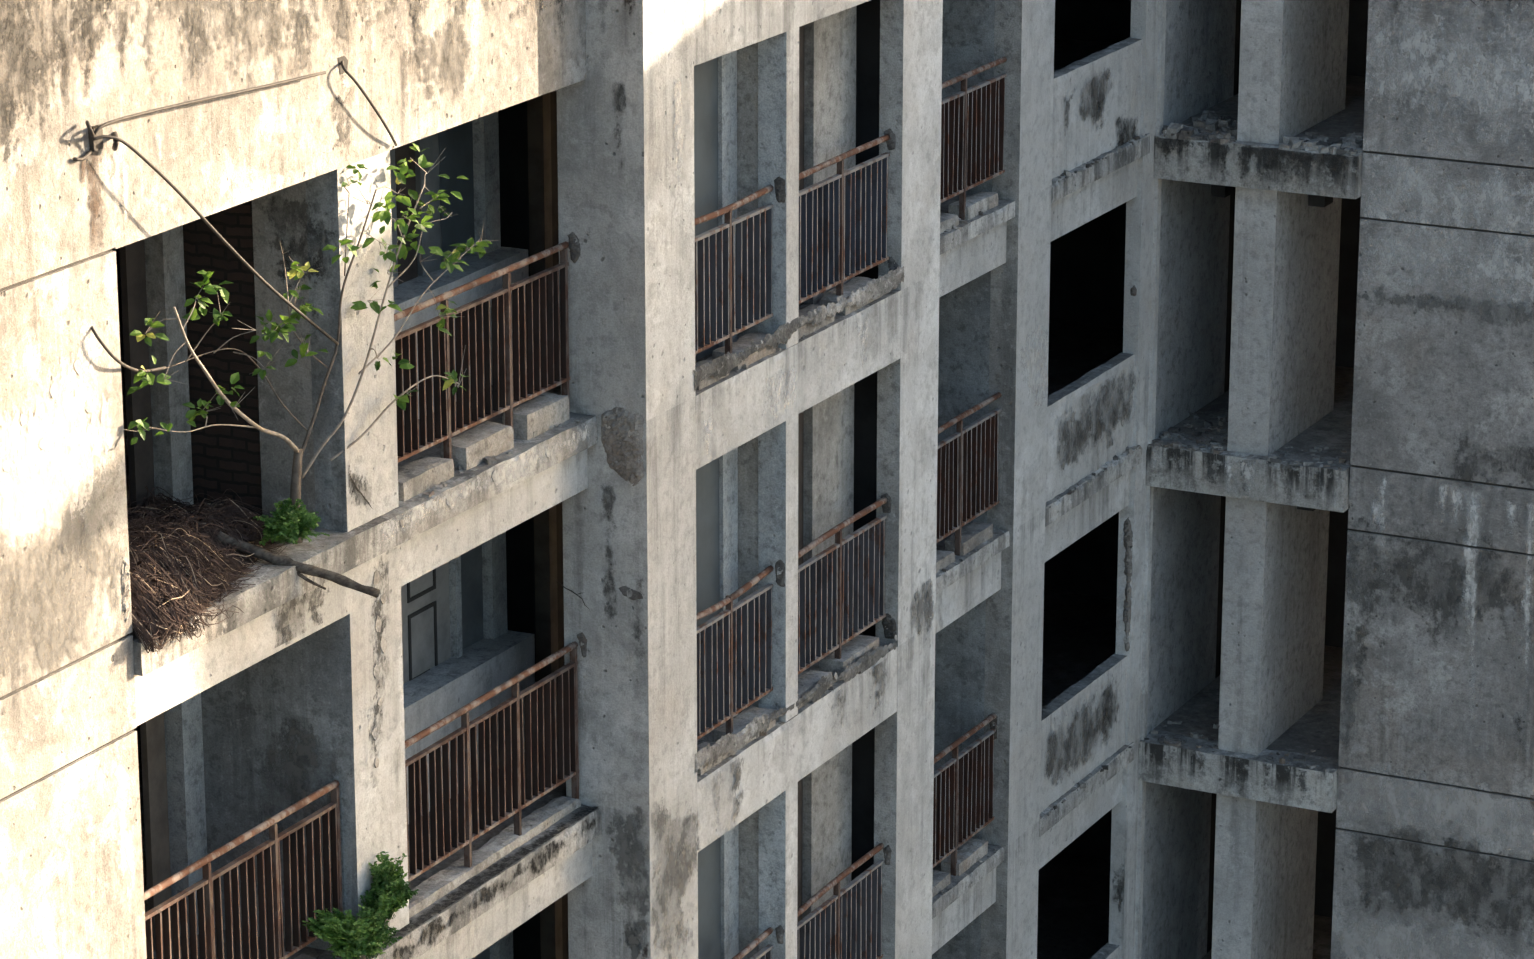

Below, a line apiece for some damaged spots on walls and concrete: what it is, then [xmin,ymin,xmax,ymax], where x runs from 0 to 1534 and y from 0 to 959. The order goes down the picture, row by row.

damp [0,0,565,164]
spalling [338,56,348,75]
damp [1064,69,1110,125]
spalling [694,257,904,392]
spalling [379,407,645,541]
damp [1339,436,1534,747]
damp [1046,684,1119,785]
damp [1353,825,1534,947]